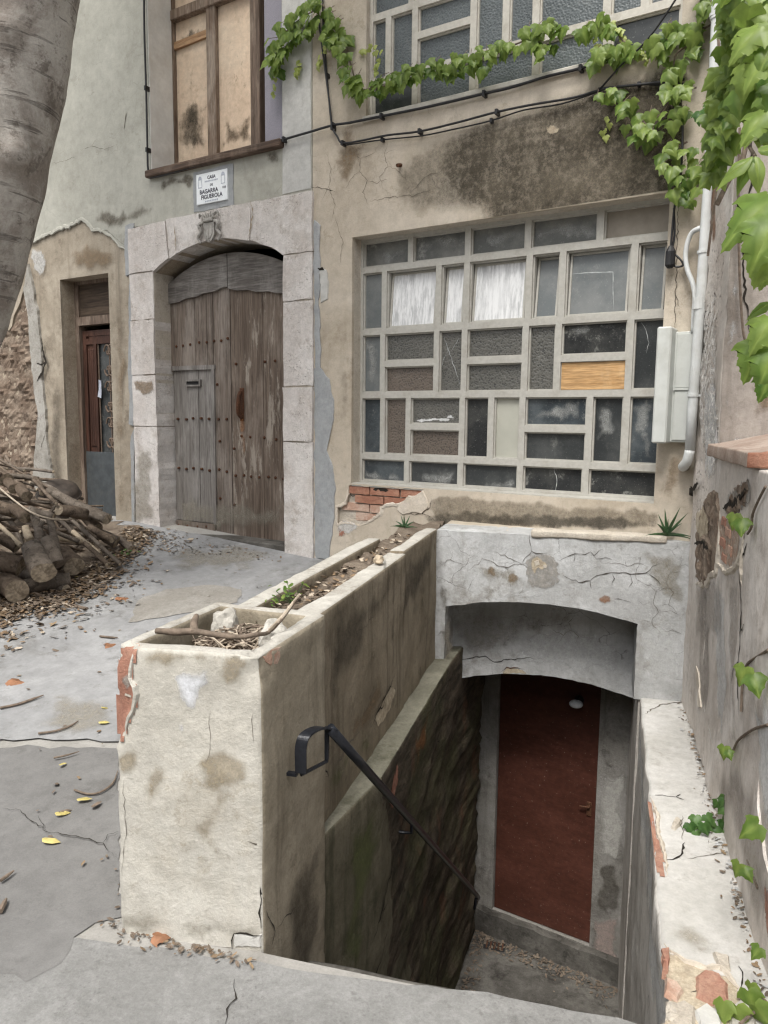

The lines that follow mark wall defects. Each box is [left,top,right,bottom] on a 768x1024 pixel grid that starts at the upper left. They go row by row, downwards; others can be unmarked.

water stain [182,106,201,145]
water stain [228,120,248,139]
water stain [405,82,682,217]
crack [312,143,447,262]
flaking render [335,485,429,527]
water stain [429,497,655,530]
spalling [526,555,559,588]
crack [445,536,680,644]
flaking render [695,479,750,591]
flaking render [647,797,669,877]
crack [664,794,717,860]
flaking render [661,944,756,1024]